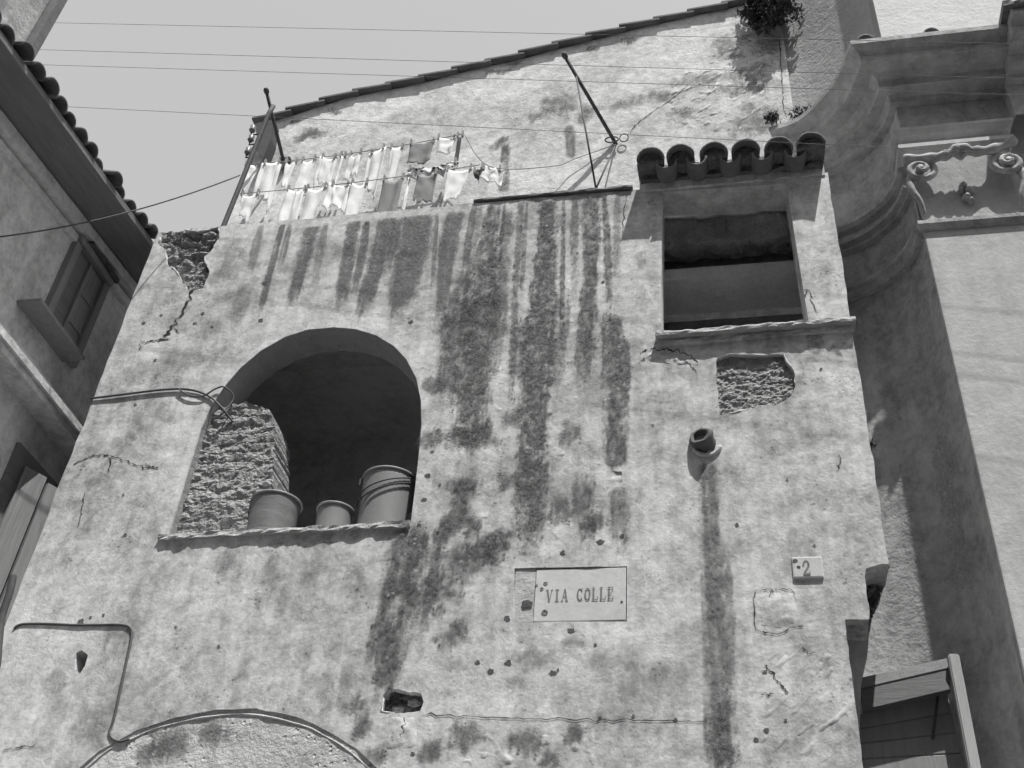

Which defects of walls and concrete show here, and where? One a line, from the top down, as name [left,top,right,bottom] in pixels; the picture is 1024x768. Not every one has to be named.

flaking render [158,228,219,291]
water stain [260,224,319,306]
crack [139,289,194,349]
crack [640,347,698,366]
flaking render [716,353,796,415]
water stain [337,136,633,698]
crack [74,454,158,472]
water stain [700,463,742,767]
flaking render [381,689,423,713]